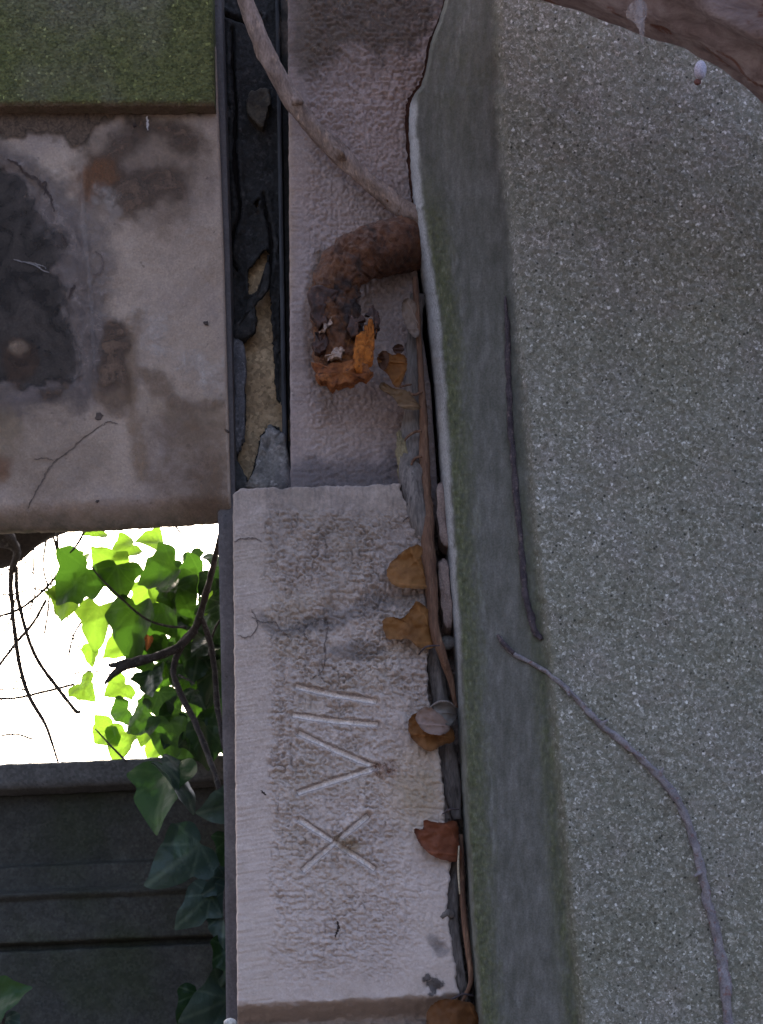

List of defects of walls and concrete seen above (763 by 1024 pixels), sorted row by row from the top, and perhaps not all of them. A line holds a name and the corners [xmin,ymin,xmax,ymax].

crack [28,421,118,508]
damp [0,116,199,418]
peeling [224,0,290,480]
rust [311,359,373,394]